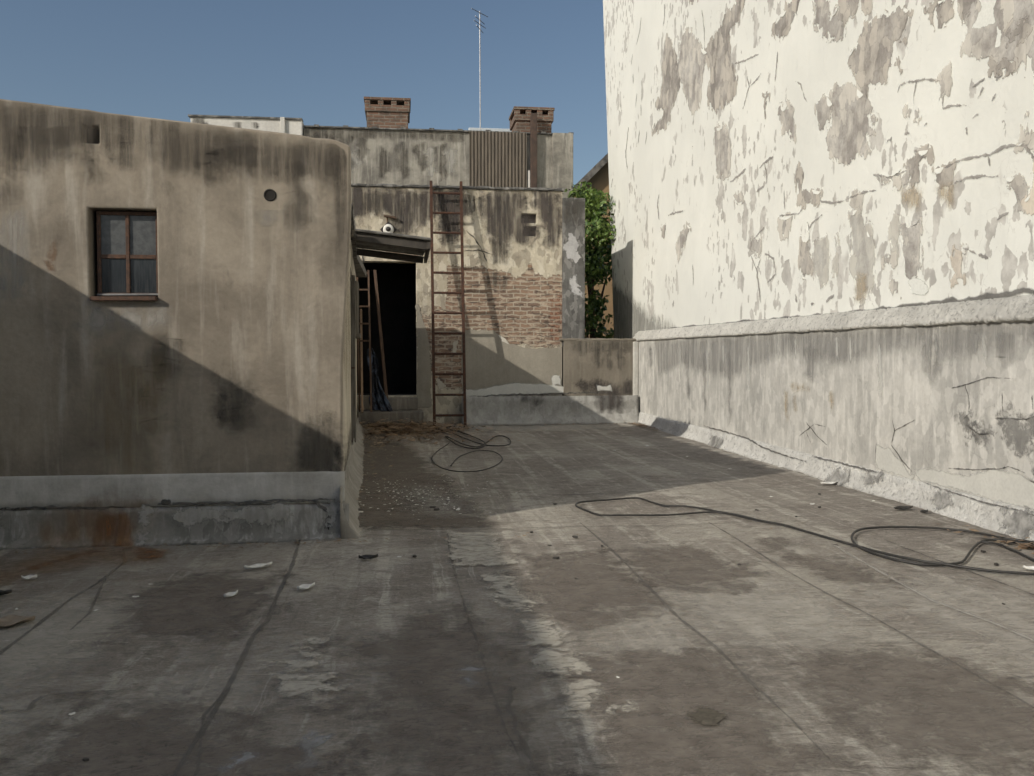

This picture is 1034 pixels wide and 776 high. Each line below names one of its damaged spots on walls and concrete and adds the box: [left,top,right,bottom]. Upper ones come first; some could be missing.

leakage [2,108,93,162]
leakage [194,119,461,222]
leakage [352,149,578,263]
peeling [651,0,745,181]
peeling [777,161,928,306]
peeling [771,0,1034,166]
peeling [903,144,956,205]
flaking render [422,233,583,390]
crack [709,420,914,473]
crack [934,466,1034,516]
crack [953,377,1033,435]
leakage [511,545,766,629]